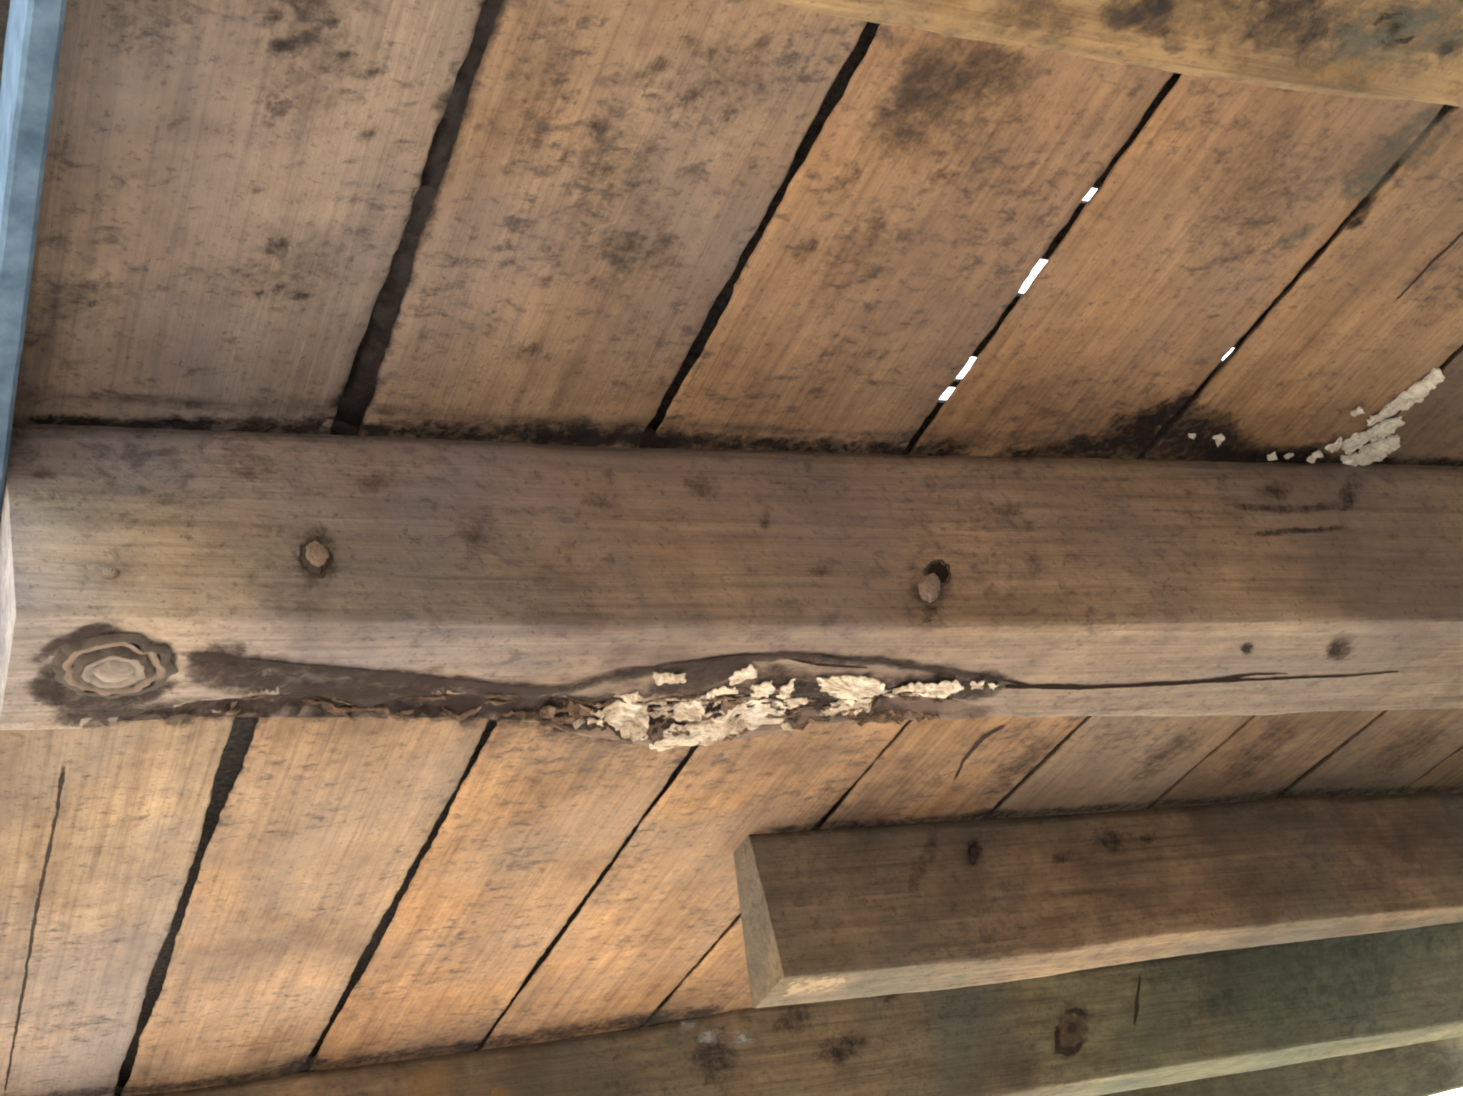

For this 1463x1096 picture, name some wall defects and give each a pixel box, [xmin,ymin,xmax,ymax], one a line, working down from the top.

damp [1105,0,1178,51]
damp [1246,0,1463,76]
damp [29,1,966,456]
crack [1396,232,1463,299]
damp [998,393,1343,464]
damp [1374,457,1463,467]
damp [1240,482,1357,536]
peeling [540,691,649,741]
peeling [653,664,999,722]
crack [623,653,1399,690]
crack [5,767,65,1091]